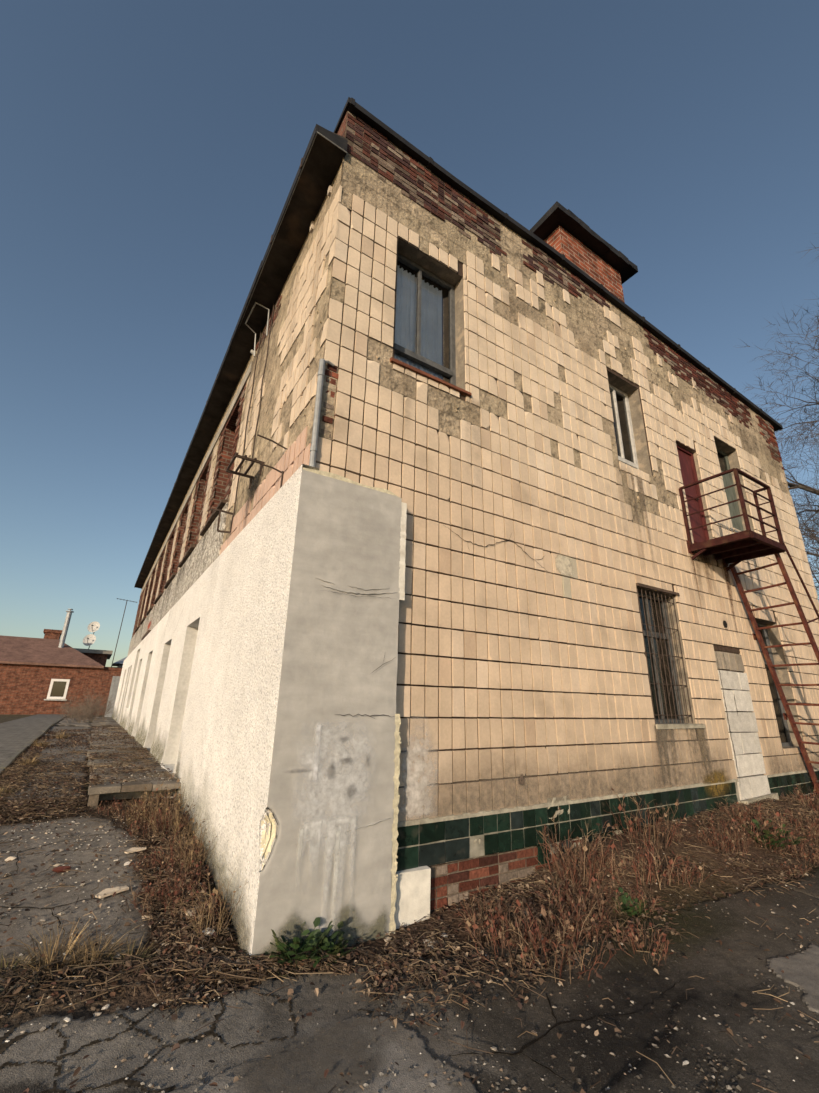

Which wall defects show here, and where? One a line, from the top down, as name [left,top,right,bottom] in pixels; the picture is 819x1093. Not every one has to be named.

spalling [132,111,791,637]
spalling [259,807,278,872]
leakage [298,724,366,898]
leakage [261,918,310,962]
leakage [327,906,386,951]
crack [0,992,297,1093]